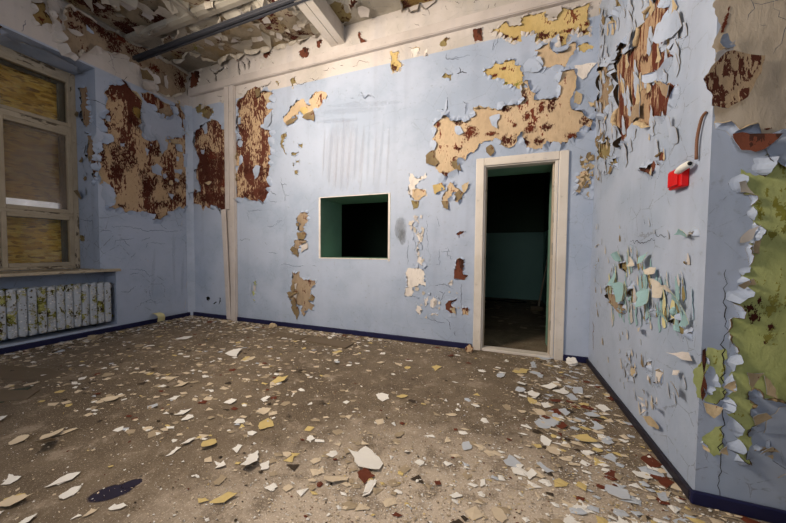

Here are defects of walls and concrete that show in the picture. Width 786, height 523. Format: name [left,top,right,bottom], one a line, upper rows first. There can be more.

peeling [327,0,369,24]
peeling [389,50,404,74]
peeling [30,0,328,224]
peeling [399,0,687,319]
peeling [290,210,310,257]
peeling [287,270,318,319]